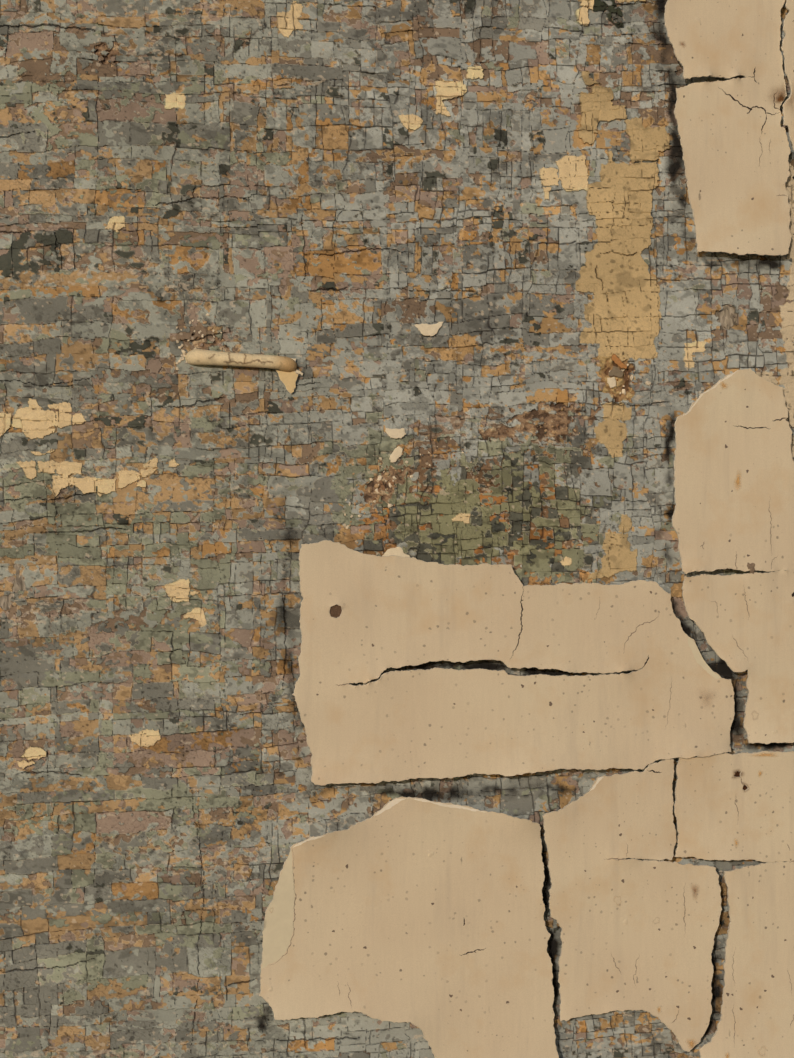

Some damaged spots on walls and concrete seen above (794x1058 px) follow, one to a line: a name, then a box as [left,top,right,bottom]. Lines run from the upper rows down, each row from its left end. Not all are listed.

crack [719,0,794,166]
crack [153,182,197,207]
peeling [0,399,180,498]
crack [38,527,120,535]
peeling [259,0,794,1058]
crack [338,667,417,686]
crack [435,660,558,676]
crack [567,655,649,676]
crack [716,670,794,755]
crack [542,758,766,1058]
crack [0,960,90,973]
crack [275,1018,360,1053]